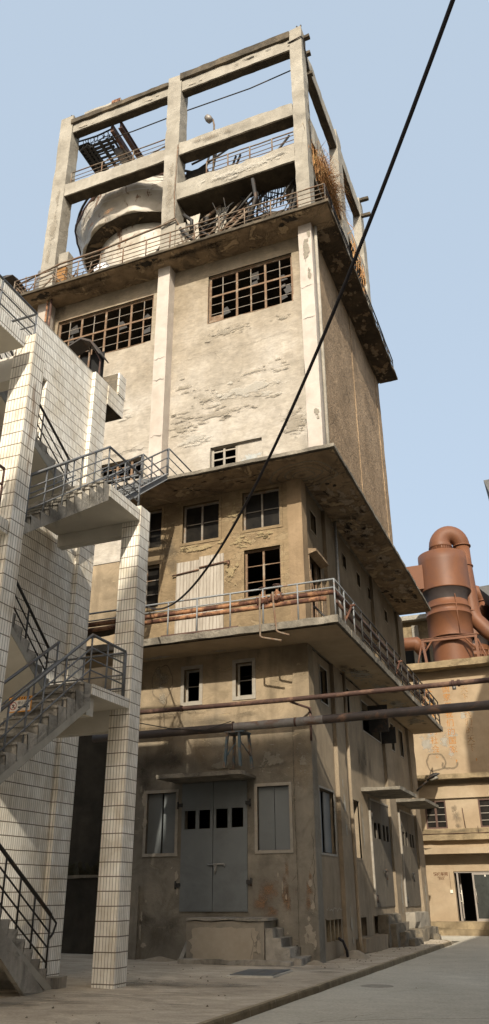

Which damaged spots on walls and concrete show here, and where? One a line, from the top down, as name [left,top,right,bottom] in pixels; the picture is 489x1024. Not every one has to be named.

peeling [279,215,388,380]
peeling [169,377,279,437]